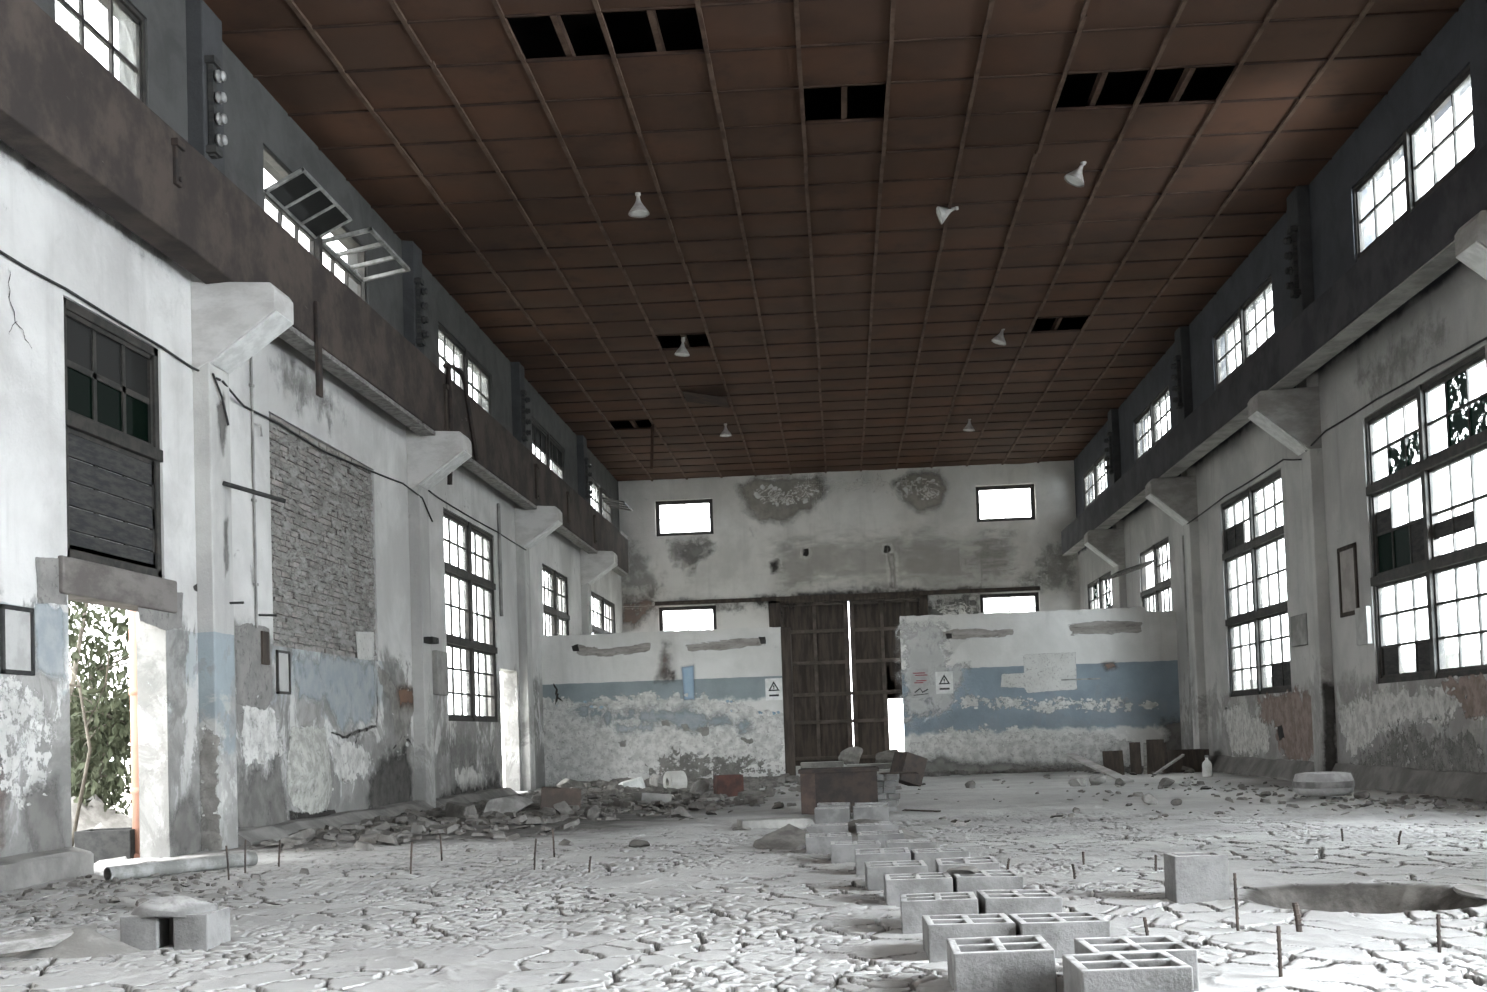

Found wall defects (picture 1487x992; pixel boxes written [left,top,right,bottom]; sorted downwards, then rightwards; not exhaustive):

peeling [0,675,58,810]
flaking render [332,739,373,784]
peeling [543,690,785,787]
peeling [909,694,1159,768]
flaking render [1223,685,1314,761]
flaking render [1338,671,1487,773]
spalling [289,810,336,820]